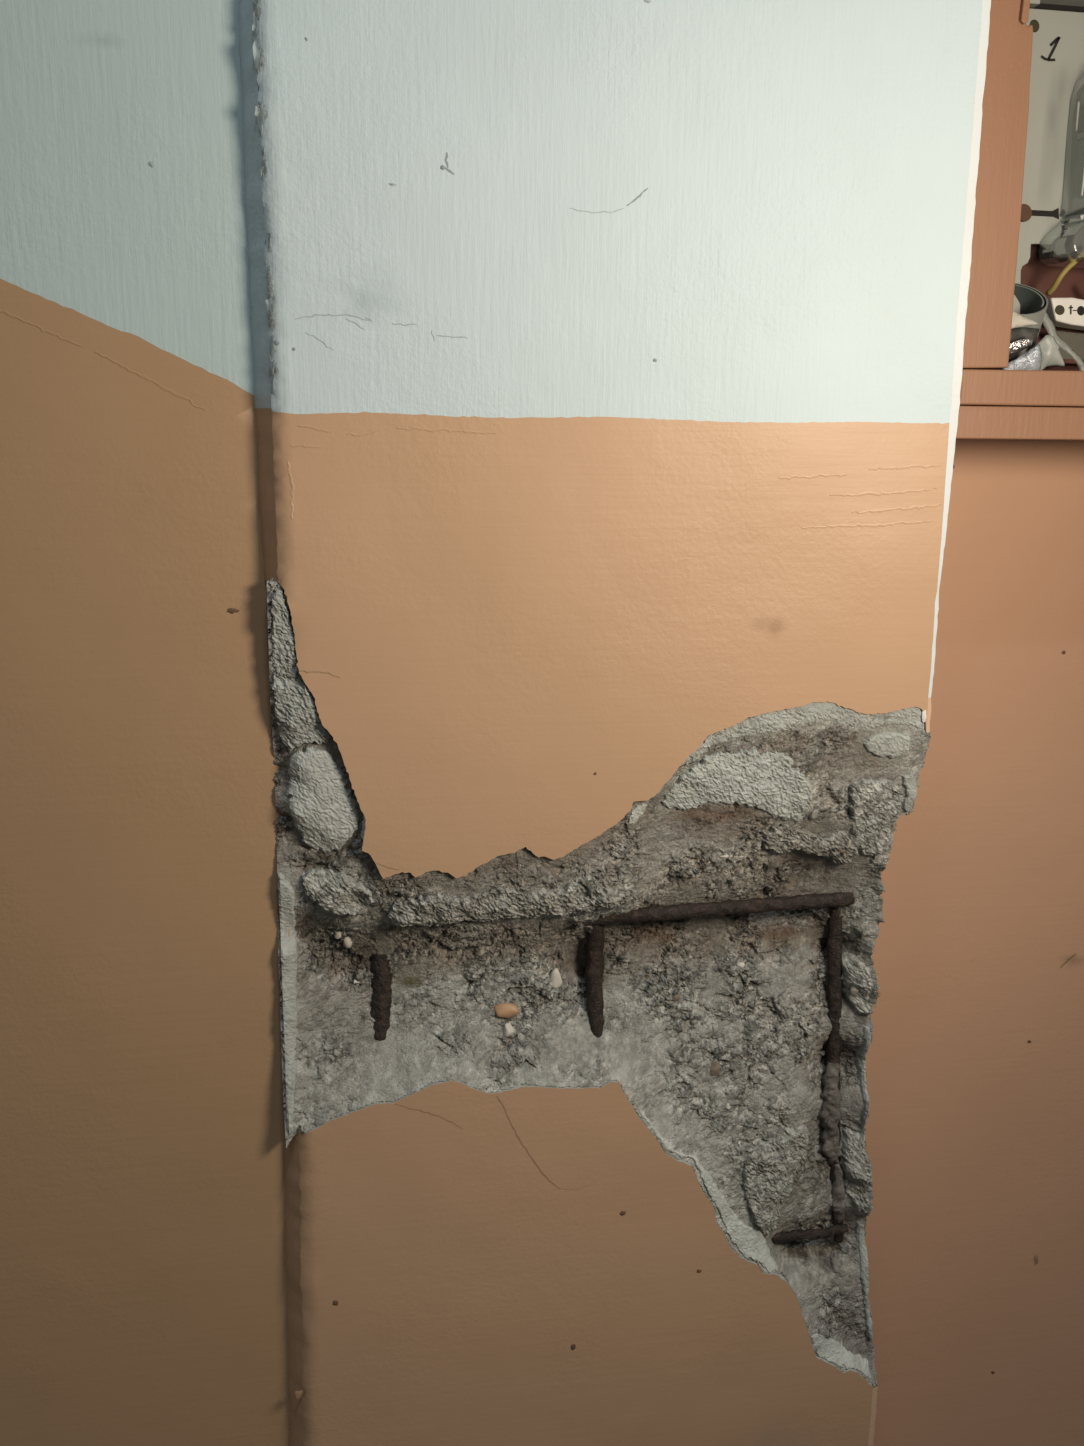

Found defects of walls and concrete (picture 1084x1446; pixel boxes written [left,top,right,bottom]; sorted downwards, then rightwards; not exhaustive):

crack [497,1096,598,1189]
spalling [267,576,931,1392]